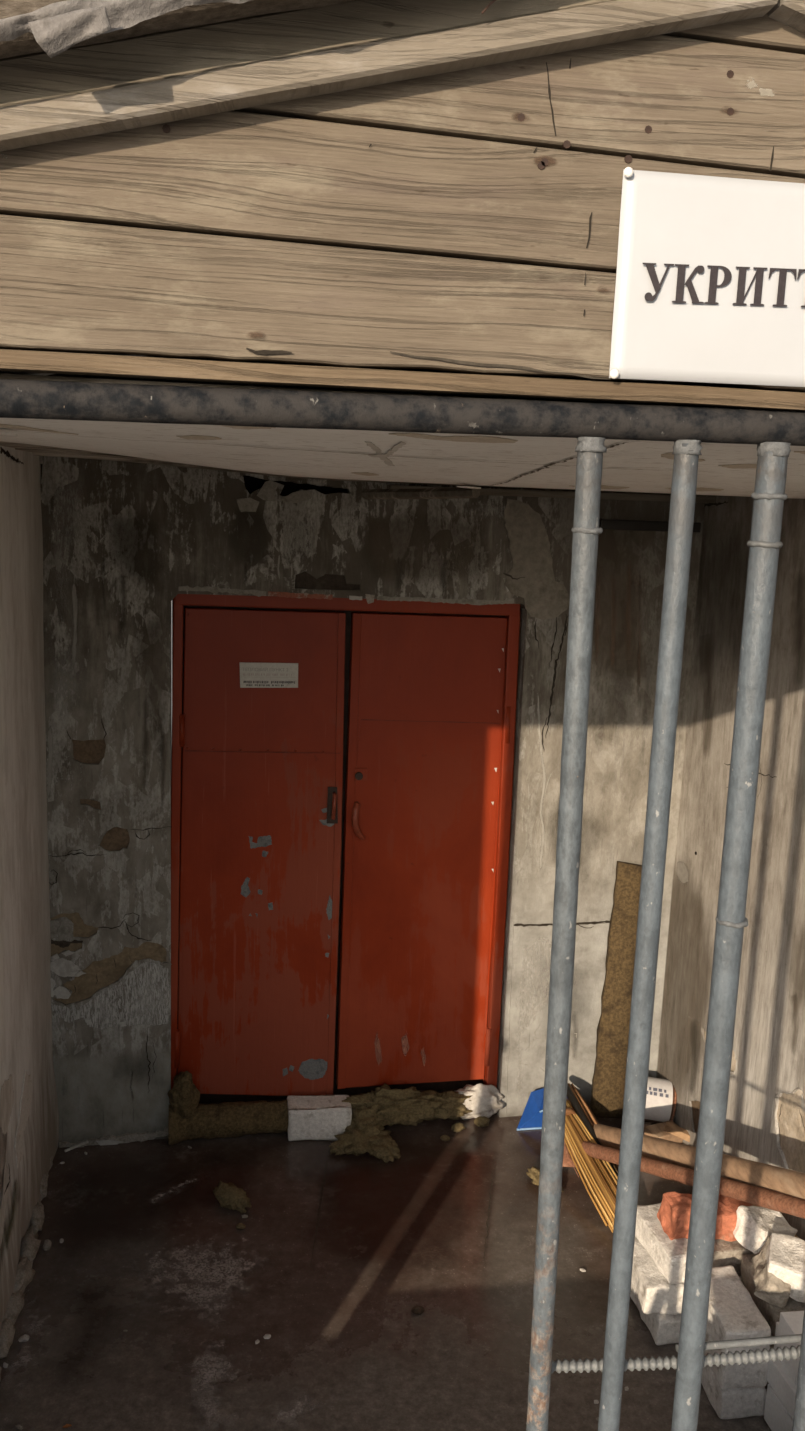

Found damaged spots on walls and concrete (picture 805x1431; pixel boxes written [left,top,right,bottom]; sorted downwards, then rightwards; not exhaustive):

crack [0,424,643,509]
spalling [237,472,378,512]
crack [534,615,569,749]
flaking render [66,719,107,767]
flaking render [98,823,170,852]
peeling [249,835,272,857]
peeling [241,877,273,916]
crack [514,920,610,928]
flaking render [50,938,172,1041]
peeling [282,1059,328,1080]
flaking render [774,1087,805,1173]
leakage [149,1238,258,1318]